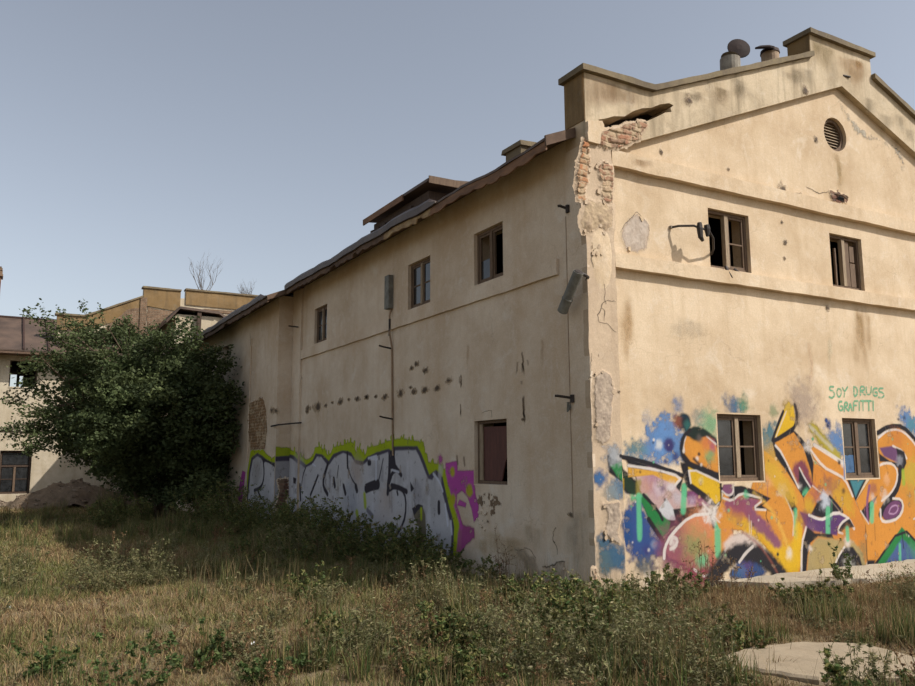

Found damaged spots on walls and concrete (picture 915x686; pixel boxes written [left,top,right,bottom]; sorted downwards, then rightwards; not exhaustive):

flaking render [572,119,652,256]
flaking render [828,188,849,205]
crack [591,249,614,331]
flaking render [247,395,278,451]
spalling [305,378,452,414]
flaking render [590,366,620,448]